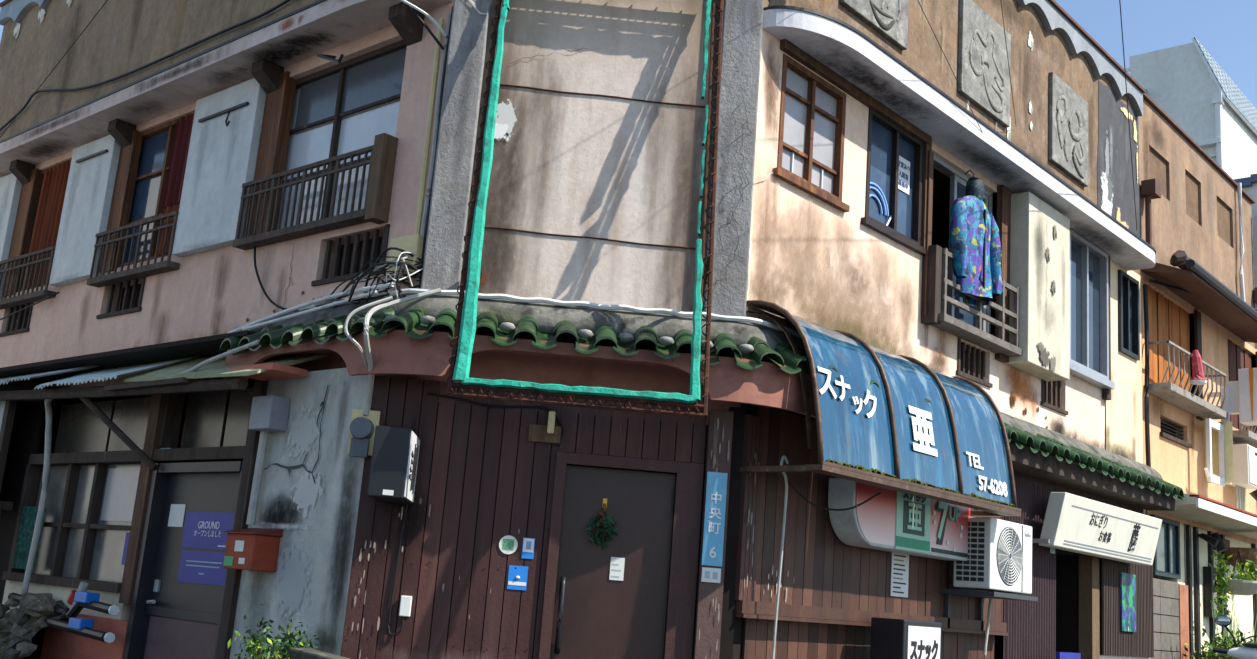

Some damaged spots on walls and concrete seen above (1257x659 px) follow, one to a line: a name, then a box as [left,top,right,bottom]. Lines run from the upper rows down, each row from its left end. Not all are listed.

peeling [494,99,517,142]
water stain [493,129,521,228]
crack [713,83,774,316]
flaking render [1097,80,1140,237]
crack [264,386,328,483]
rust [1012,372,1037,407]
water stain [266,497,308,529]
water stain [331,471,353,613]